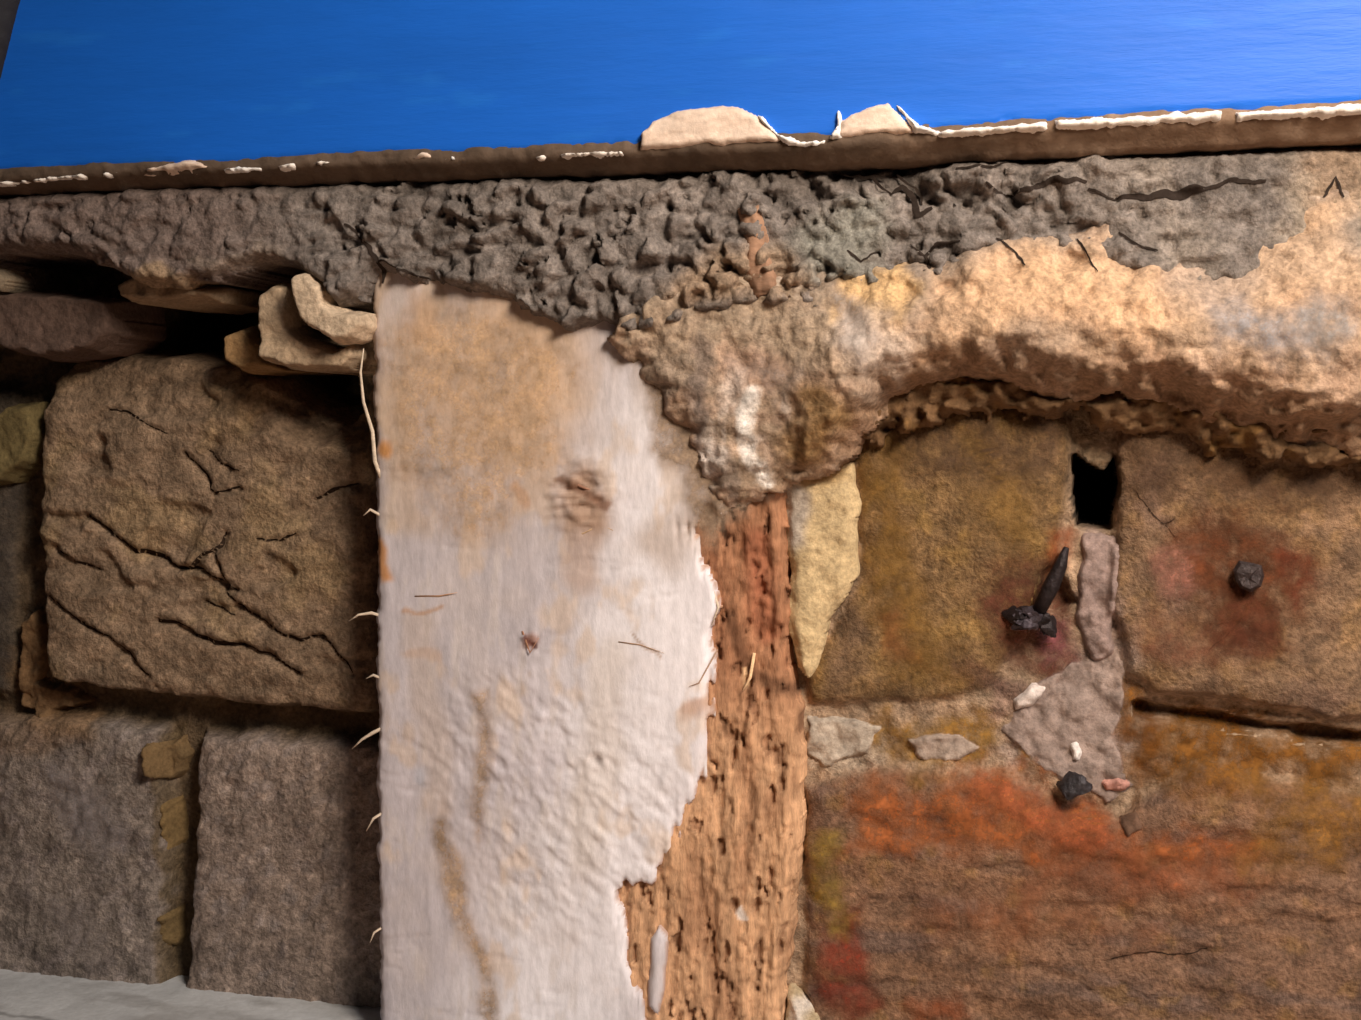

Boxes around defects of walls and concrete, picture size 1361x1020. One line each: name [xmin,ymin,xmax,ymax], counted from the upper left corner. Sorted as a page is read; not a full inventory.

crack [109,408,241,494]
crack [316,483,359,499]
crack [57,546,100,569]
crack [50,595,149,675]
crack [89,514,353,673]
rust [985,563,1069,677]
rust [853,772,1263,896]